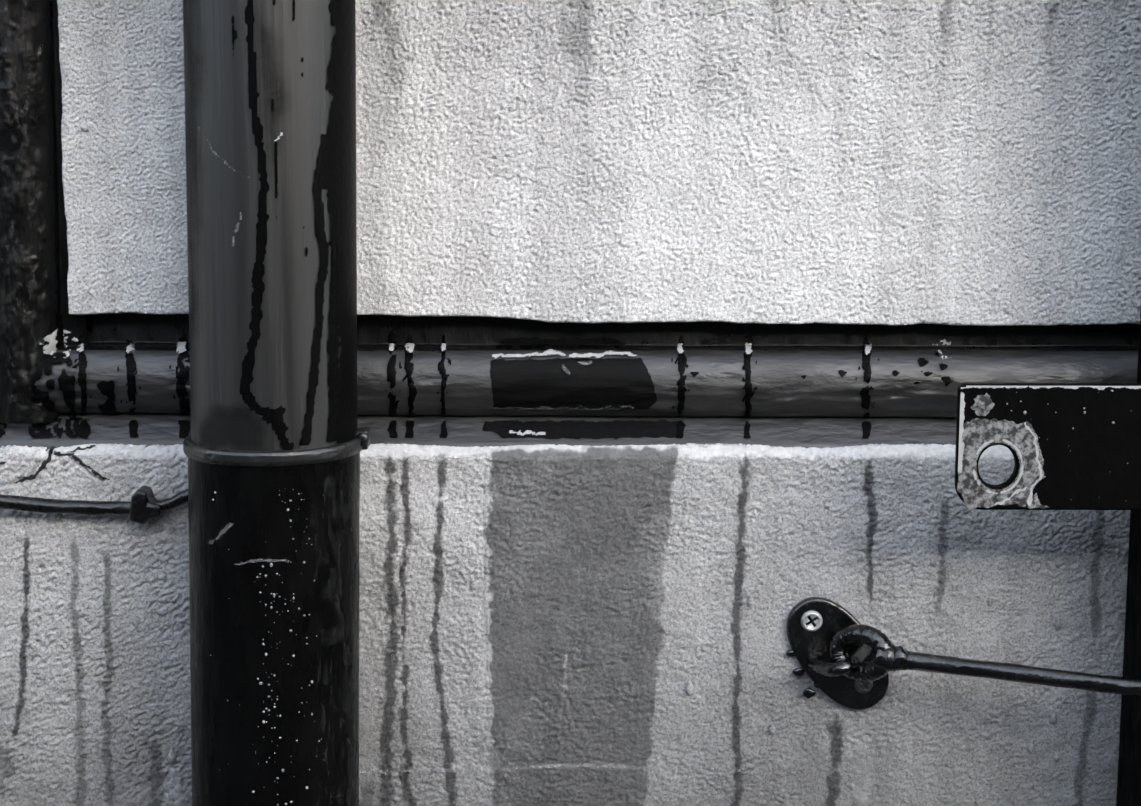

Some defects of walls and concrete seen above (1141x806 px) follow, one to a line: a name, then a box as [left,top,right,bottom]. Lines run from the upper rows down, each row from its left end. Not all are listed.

damp [380,334,417,438]
damp [436,335,451,438]
damp [742,335,757,438]
damp [855,335,880,439]
damp [12,539,30,737]
damp [380,456,417,806]
damp [430,463,457,806]
damp [484,335,690,806]
damp [731,459,749,806]
damp [863,463,877,599]
damp [825,720,844,806]